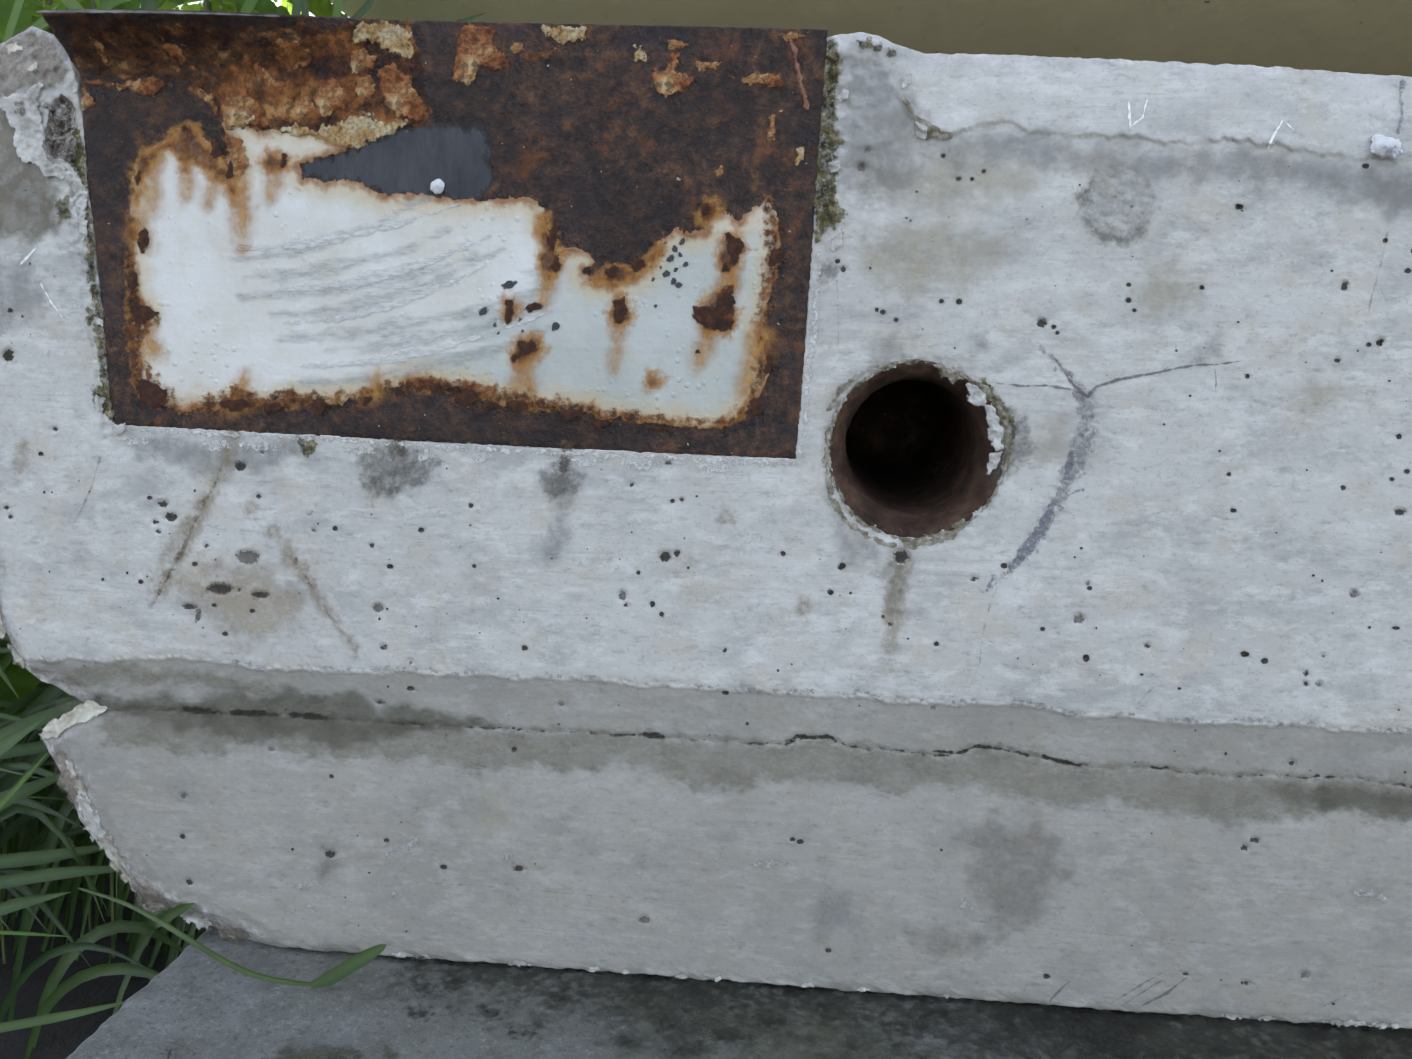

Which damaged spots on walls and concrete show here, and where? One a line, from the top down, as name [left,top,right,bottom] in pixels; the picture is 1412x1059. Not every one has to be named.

peeling [0,18,492,212]
rust [123,123,786,432]
rust [560,440,572,472]
spalling [0,612,25,668]
crack [156,706,665,739]
crack [748,734,1087,767]
spalling [39,700,249,940]
water stain [407,974,536,1037]